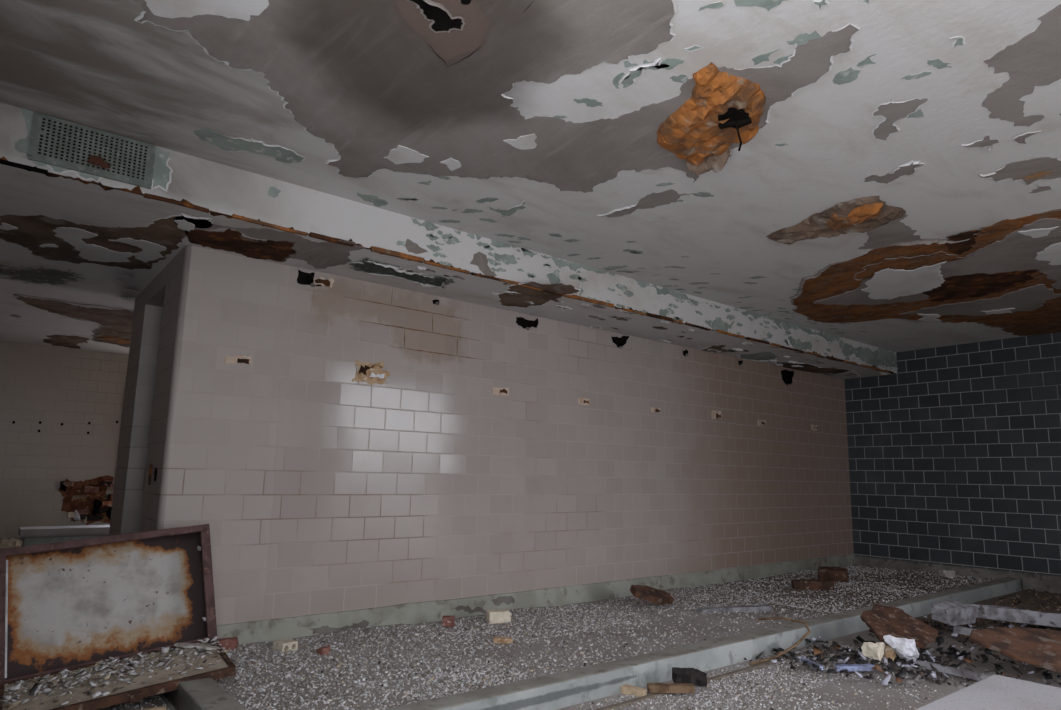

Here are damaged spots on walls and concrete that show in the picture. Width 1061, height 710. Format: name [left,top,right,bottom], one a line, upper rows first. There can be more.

peeling [132,0,706,218]
peeling [717,22,862,157]
peeling [871,97,928,140]
peeling [960,4,1061,151]
peeling [864,160,926,184]
peeling [977,157,1061,193]
flaking render [14,294,134,349]
peeling [0,212,465,305]
spalling [352,360,391,385]
peeling [470,252,637,349]
peeling [653,320,860,386]
flaking render [790,209,1061,336]